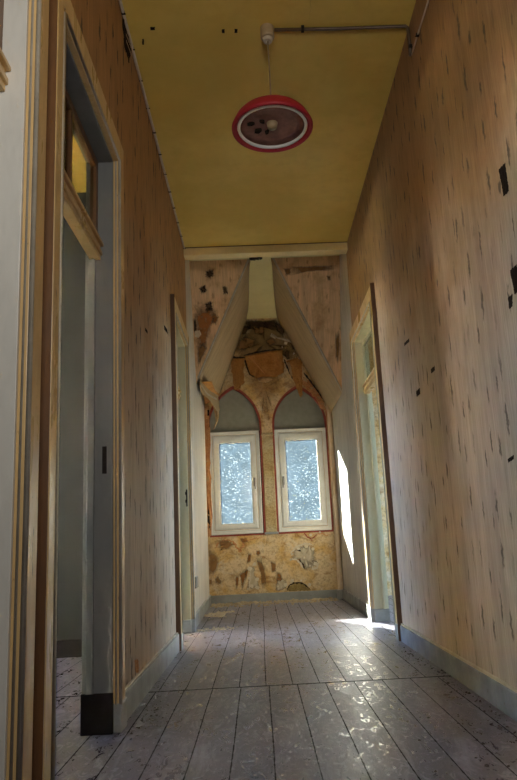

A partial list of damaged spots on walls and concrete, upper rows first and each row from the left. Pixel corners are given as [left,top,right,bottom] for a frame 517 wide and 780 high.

spalling [276,579,311,591]